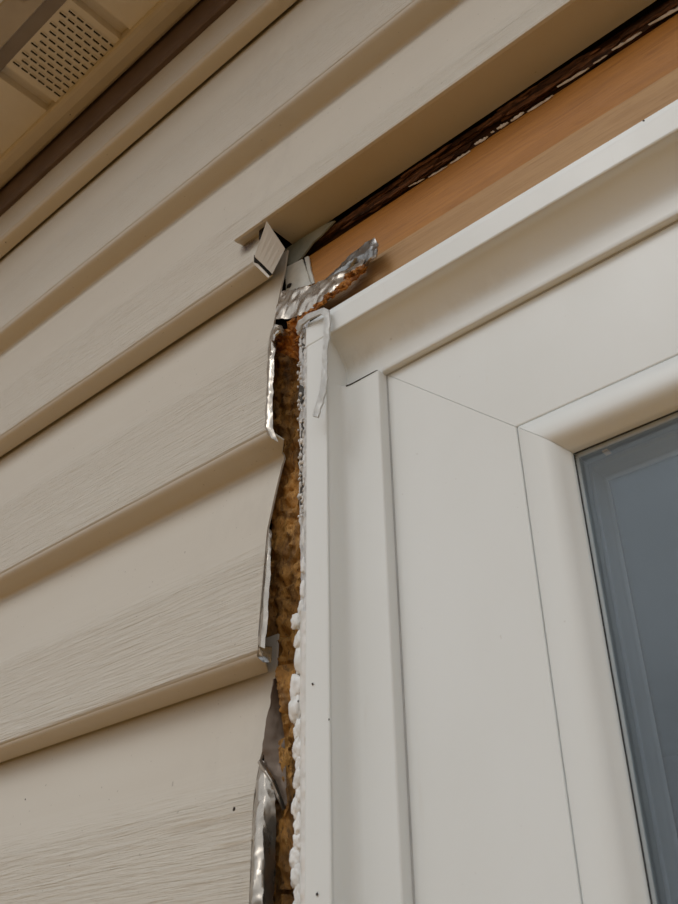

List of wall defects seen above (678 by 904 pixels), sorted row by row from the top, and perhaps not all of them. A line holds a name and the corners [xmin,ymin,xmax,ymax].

peeling [296,308,331,418]